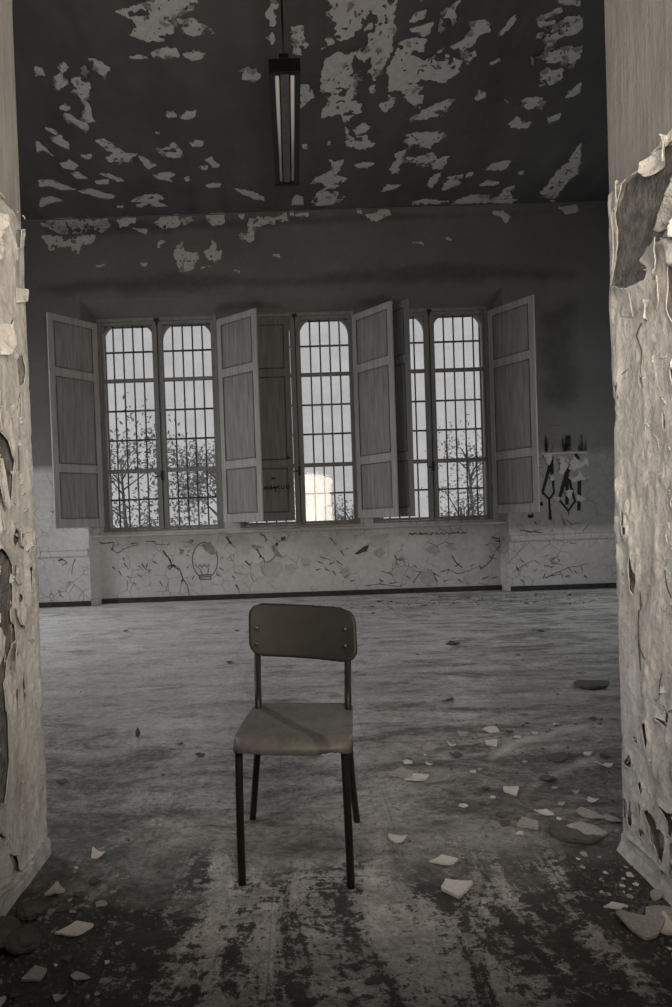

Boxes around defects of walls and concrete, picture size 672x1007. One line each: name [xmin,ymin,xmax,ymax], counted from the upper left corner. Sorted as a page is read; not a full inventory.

peeling [34,58,225,272]
peeling [115,0,214,61]
peeling [234,159,374,242]
peeling [300,0,524,223]
peeling [508,0,583,129]
peeling [540,144,583,215]
peeling [0,192,48,899]
crack [100,541,190,596]
crack [226,533,276,593]
crack [316,520,587,587]
peeling [608,129,672,881]
crack [627,559,662,701]